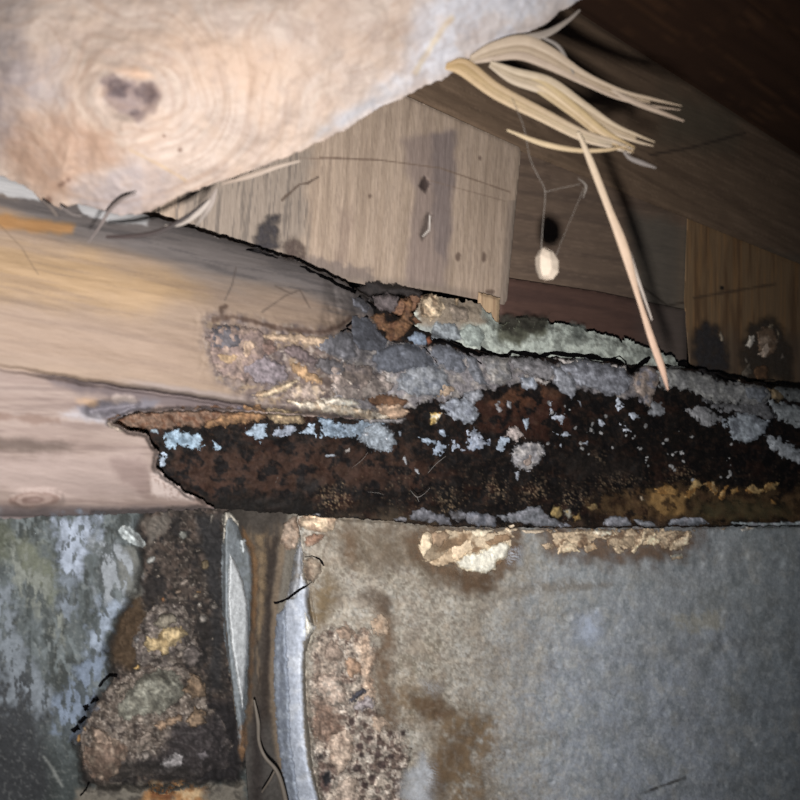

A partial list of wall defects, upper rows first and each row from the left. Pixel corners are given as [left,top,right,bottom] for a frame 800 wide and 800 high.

mould [500,315,547,335]
leakage [693,322,728,374]
mould [738,319,791,384]
rust [108,404,304,432]
spalling [394,506,709,590]
rust [603,479,800,525]
peeling [722,521,800,531]
leakage [0,510,133,738]
peeling [221,512,253,744]
spalling [274,513,412,800]